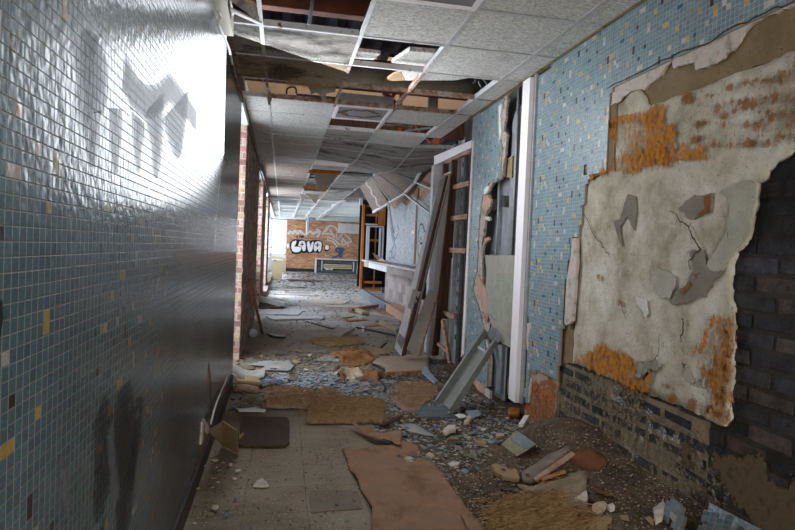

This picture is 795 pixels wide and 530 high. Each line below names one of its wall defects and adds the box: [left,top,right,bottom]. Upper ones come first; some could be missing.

flaking render [611,2,795,105]
rust [589,57,795,181]
flaking render [473,94,512,363]
flaking render [613,194,638,247]
rust [524,377,556,422]
rust [574,342,652,393]
rust [687,307,737,424]